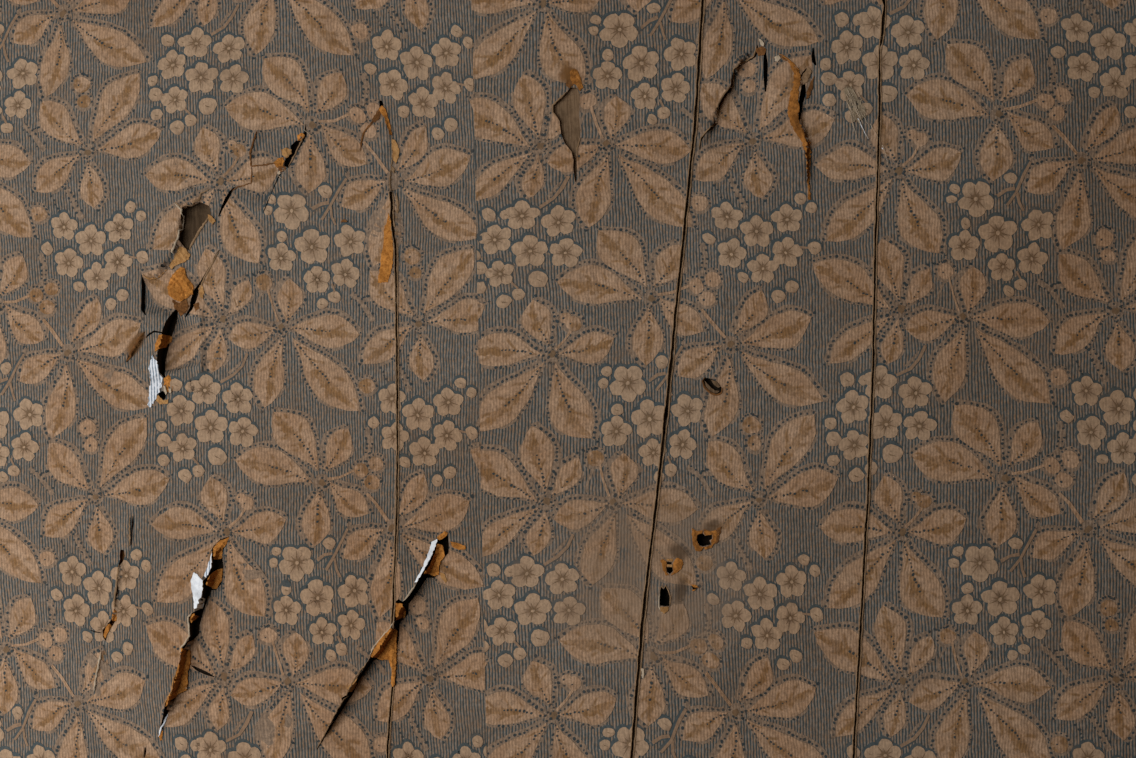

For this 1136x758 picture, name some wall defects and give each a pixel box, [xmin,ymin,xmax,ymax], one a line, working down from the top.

spalling [264,125,307,211]
spalling [553,87,580,182]
spalling [700,45,768,149]
spalling [799,48,816,120]
spalling [178,187,235,250]
spalling [141,268,209,400]
crack [127,517,135,546]
spalling [182,536,229,651]
spalling [391,535,449,647]
spalling [658,558,683,614]
spalling [692,527,721,551]
spalling [317,646,385,750]